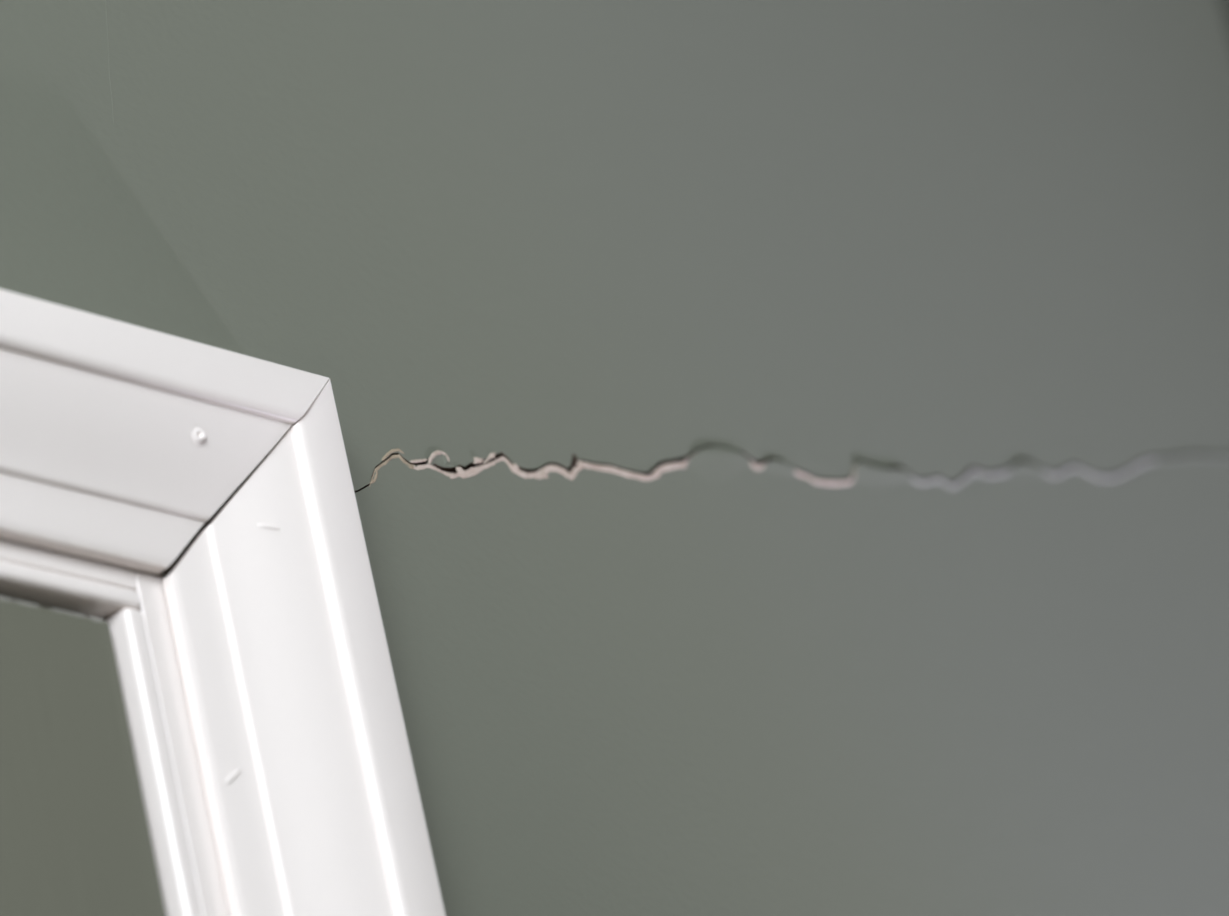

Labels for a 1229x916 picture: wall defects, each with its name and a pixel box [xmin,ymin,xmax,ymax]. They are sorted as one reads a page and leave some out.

crack [354,445,1229,493]